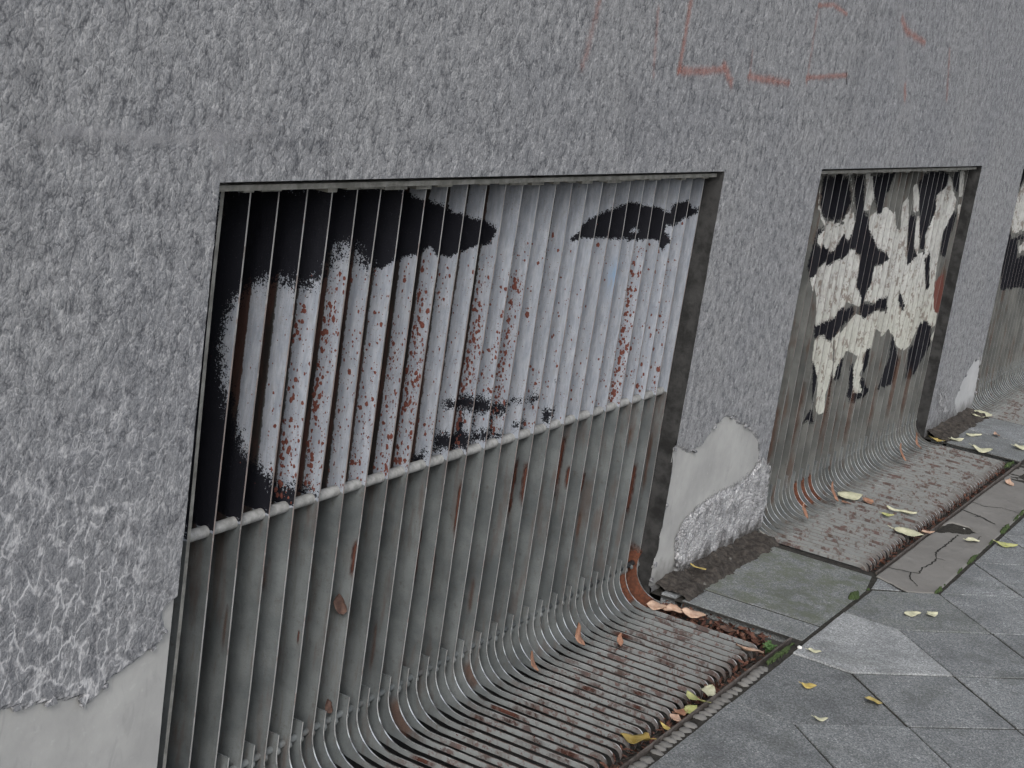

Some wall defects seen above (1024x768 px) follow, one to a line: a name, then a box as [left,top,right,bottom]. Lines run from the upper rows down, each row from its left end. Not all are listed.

corrosion [258,232,677,504]
flaking render [955,357,982,413]
flaking render [649,416,761,586]
corrosion [794,474,821,508]
corrosion [620,545,654,613]
crack [889,502,1015,591]
flaking render [0,599,174,768]